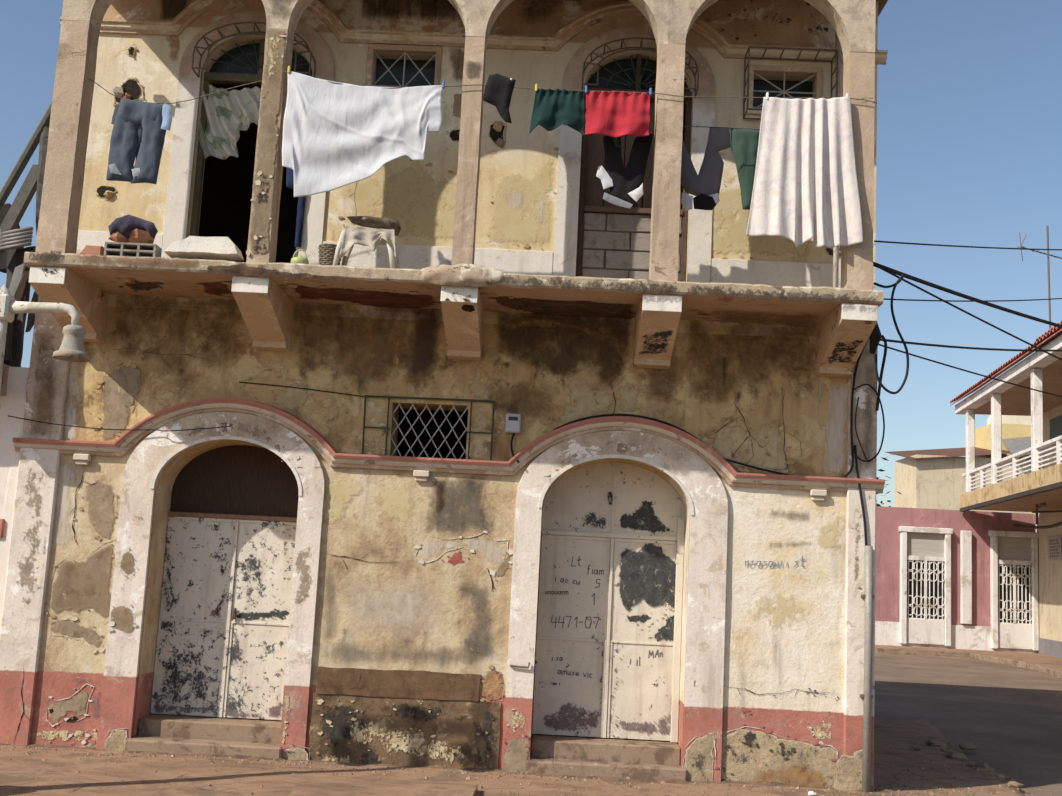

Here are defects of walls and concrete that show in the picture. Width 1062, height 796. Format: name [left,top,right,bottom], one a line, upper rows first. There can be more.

flaking render [202,29,356,300]
water stain [295,303,438,385]
water stain [499,313,630,382]
crack [713,397,802,473]
crack [69,471,98,543]
water stain [427,479,488,533]
flaking render [16,466,137,653]
peeling [154,526,351,763]
flaking render [37,684,127,751]
flaking render [349,712,472,766]
flaking render [479,665,504,702]
flaking render [683,707,875,791]